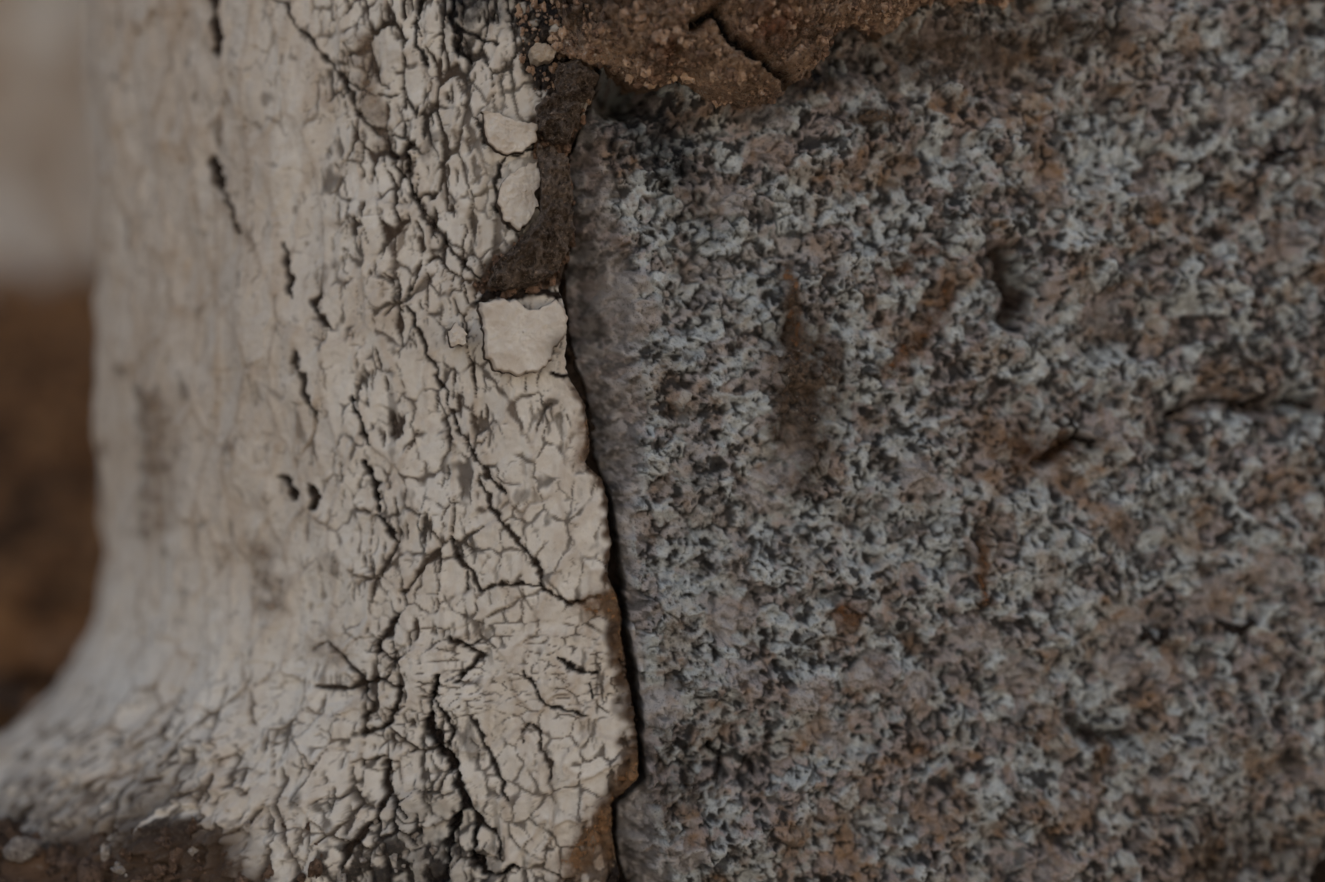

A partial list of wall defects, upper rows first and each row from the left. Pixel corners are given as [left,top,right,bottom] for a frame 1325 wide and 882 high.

crack [212,0,224,57]
crack [211,157,242,235]
spalling [447,0,599,377]
crack [275,0,641,882]